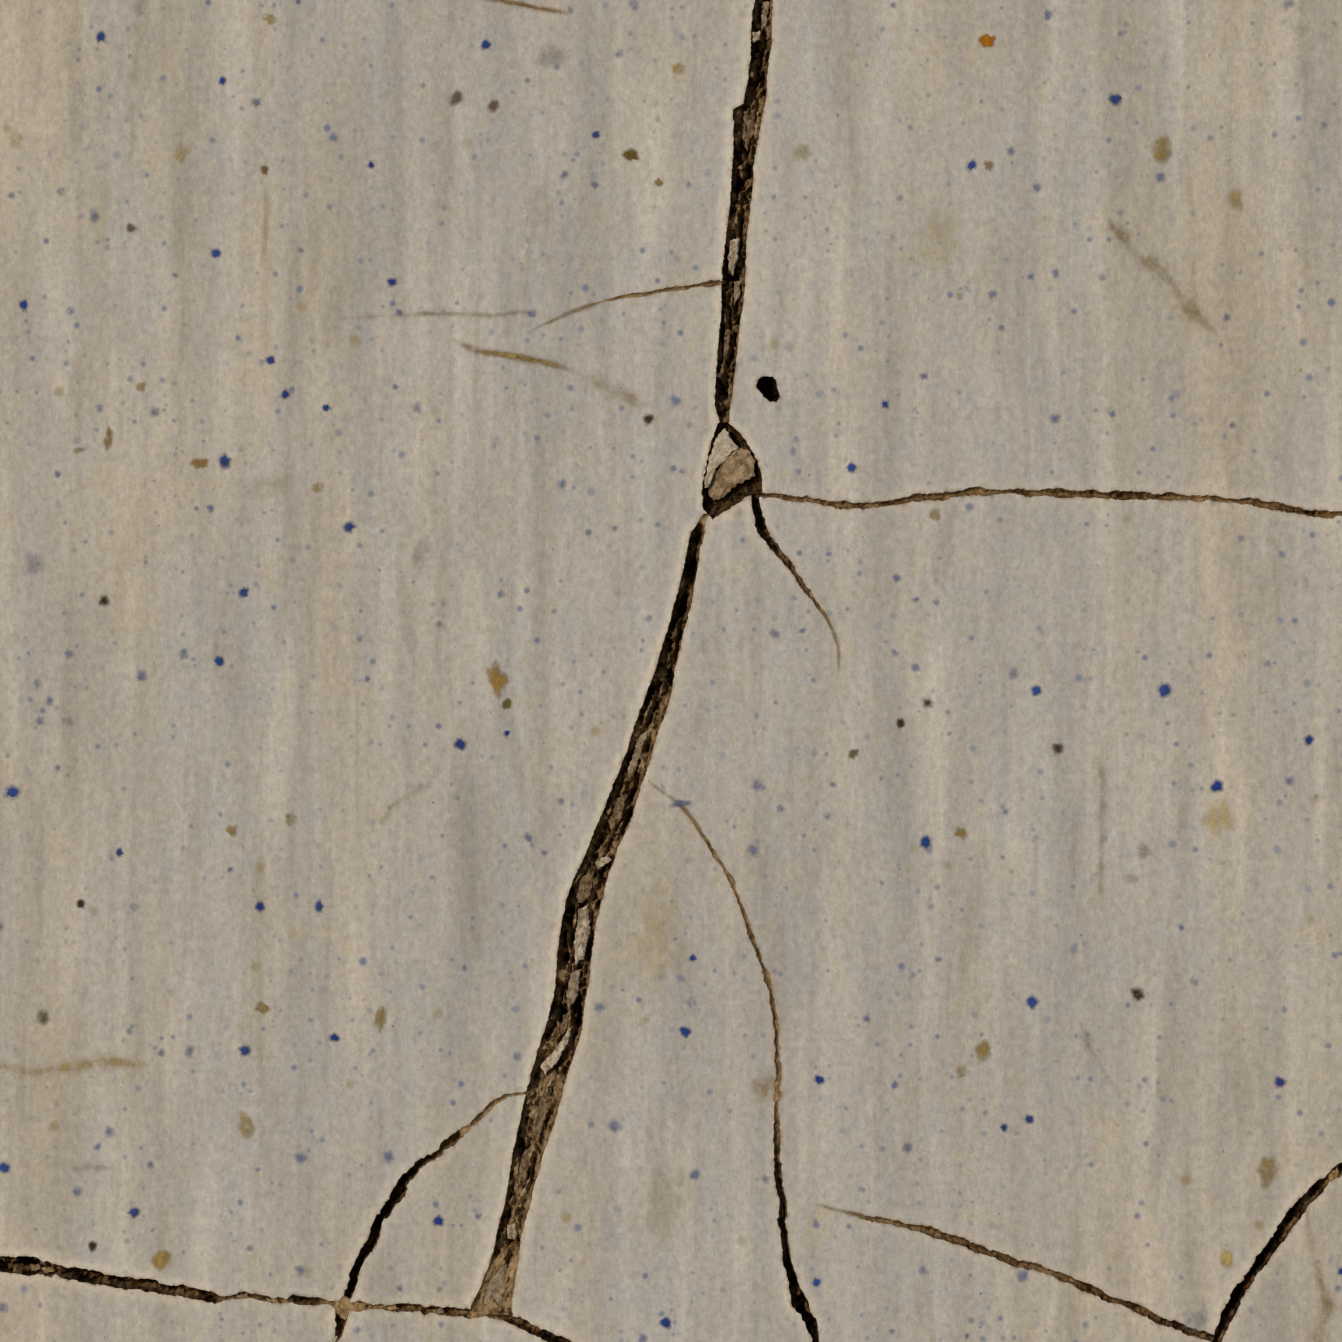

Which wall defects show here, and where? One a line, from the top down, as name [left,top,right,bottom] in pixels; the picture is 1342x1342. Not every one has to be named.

crack [491,0,560,12]
crack [551,0,778,423]
crack [463,345,562,368]
crack [746,480,1342,657]
crack [0,510,824,1342]
crack [827,1155,1342,1342]